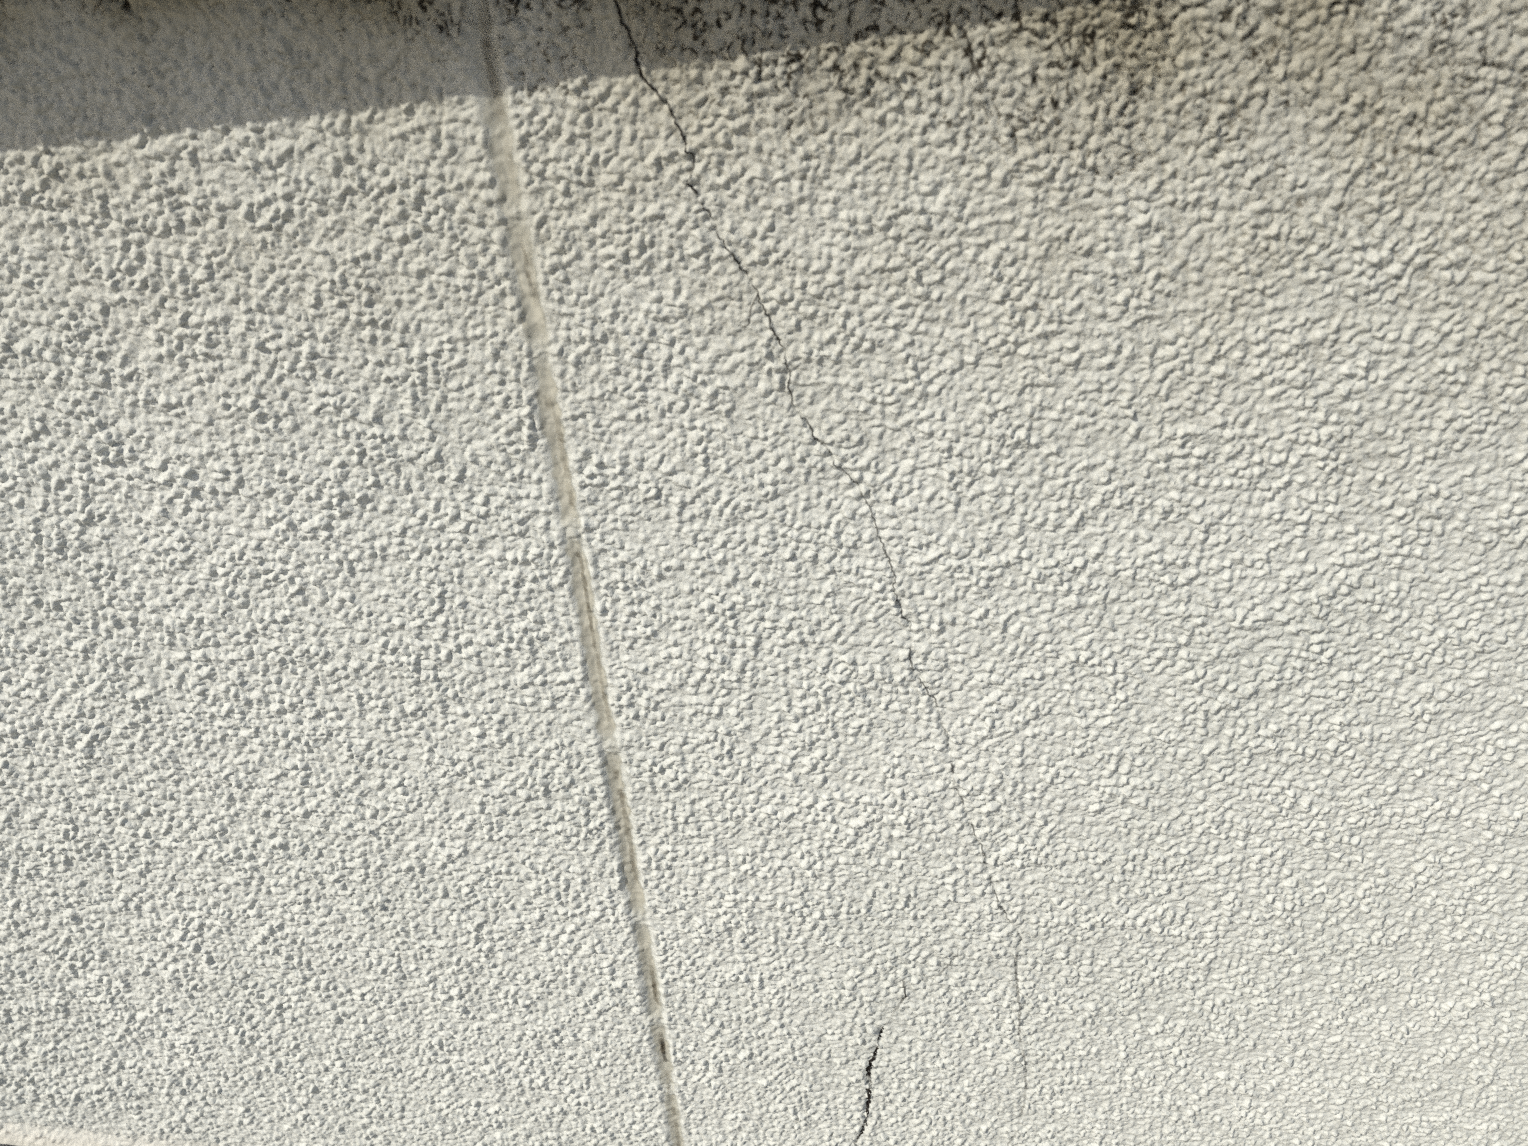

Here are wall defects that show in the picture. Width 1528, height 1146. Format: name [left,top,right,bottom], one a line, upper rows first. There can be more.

leakage [369,0,461,34]
leakage [497,0,591,61]
leakage [636,0,1279,152]
leakage [1398,0,1474,74]
crack [613,0,937,704]
crack [856,987,907,1142]